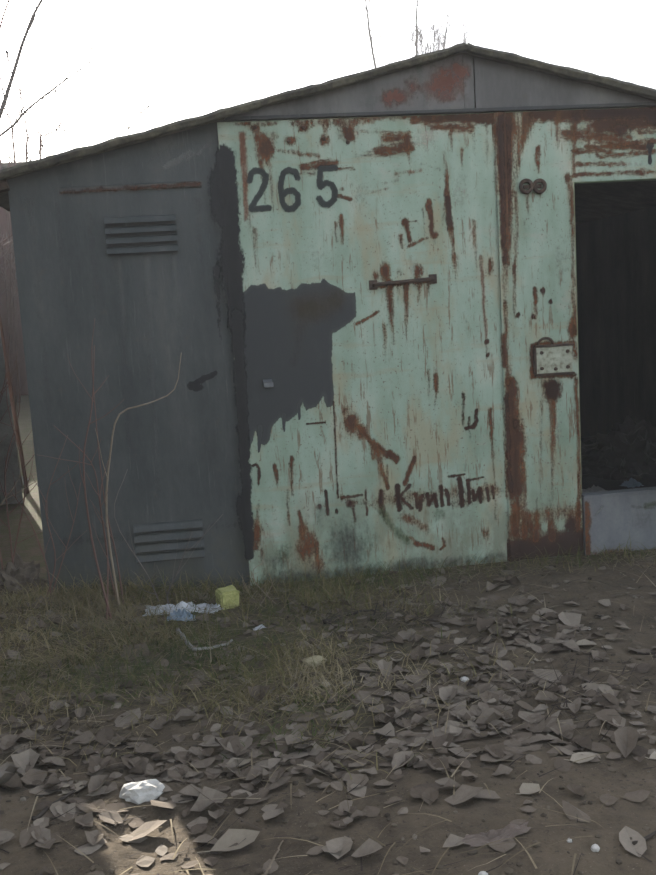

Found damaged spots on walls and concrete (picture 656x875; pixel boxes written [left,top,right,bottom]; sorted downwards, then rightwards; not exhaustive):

corrosion [236,107,656,574]